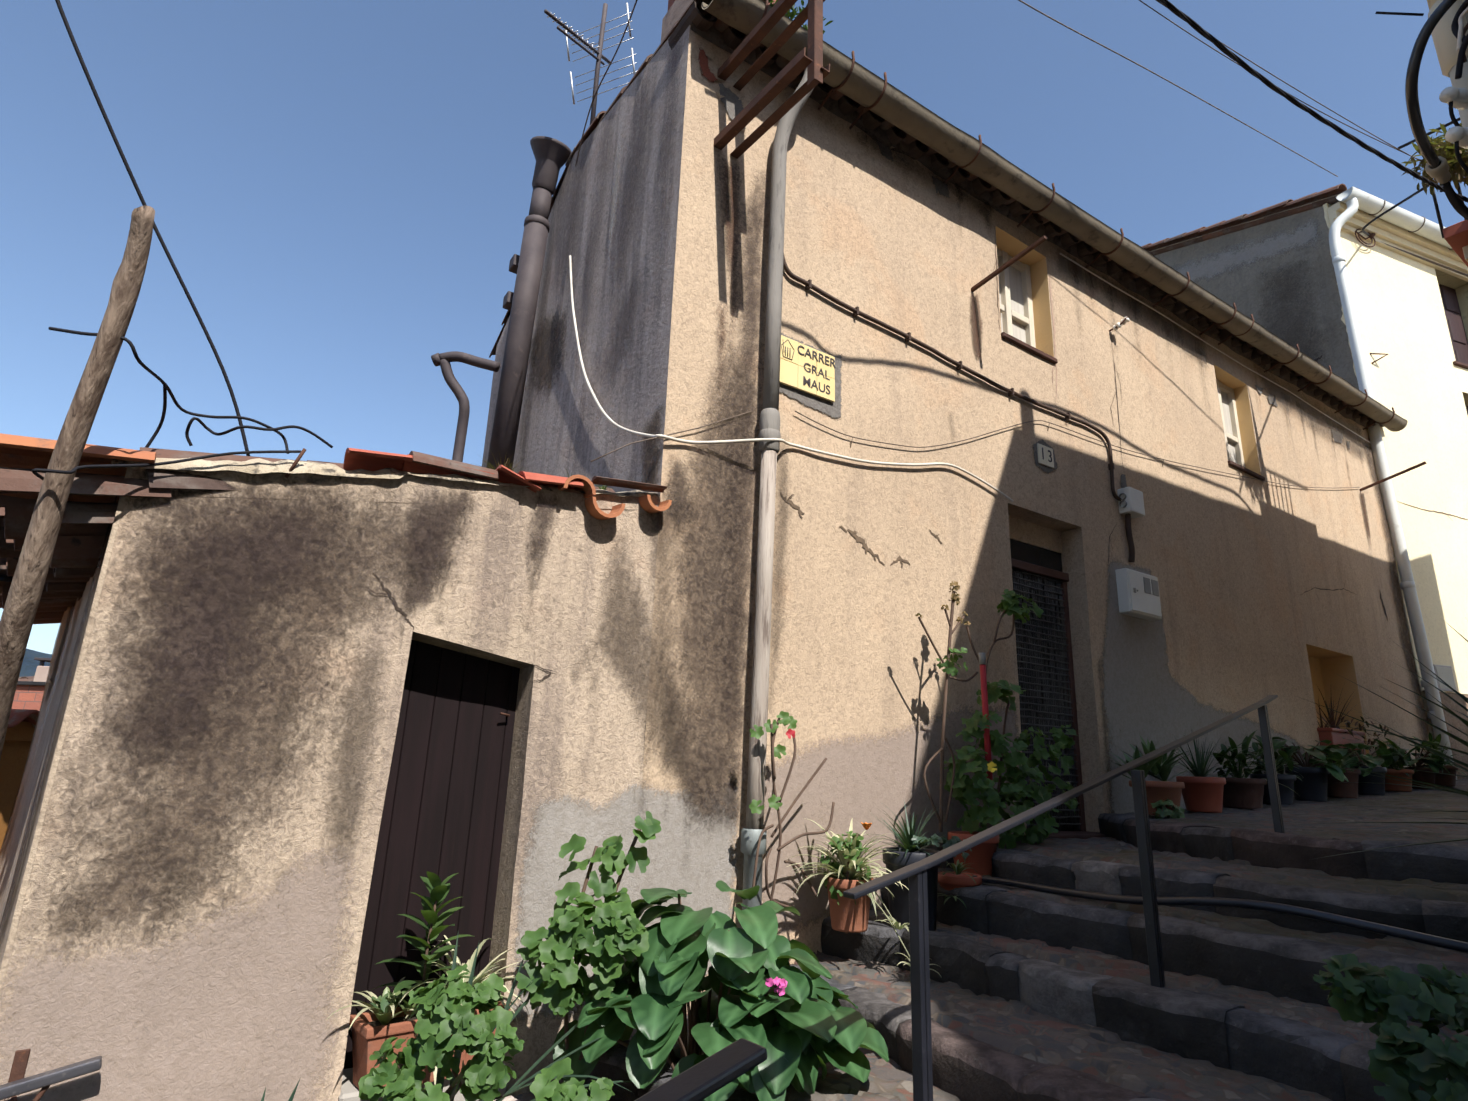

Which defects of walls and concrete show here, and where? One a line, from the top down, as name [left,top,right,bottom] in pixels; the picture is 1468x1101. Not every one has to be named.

leakage [0,482,471,945]
leakage [531,313,566,392]
leakage [600,179,767,823]